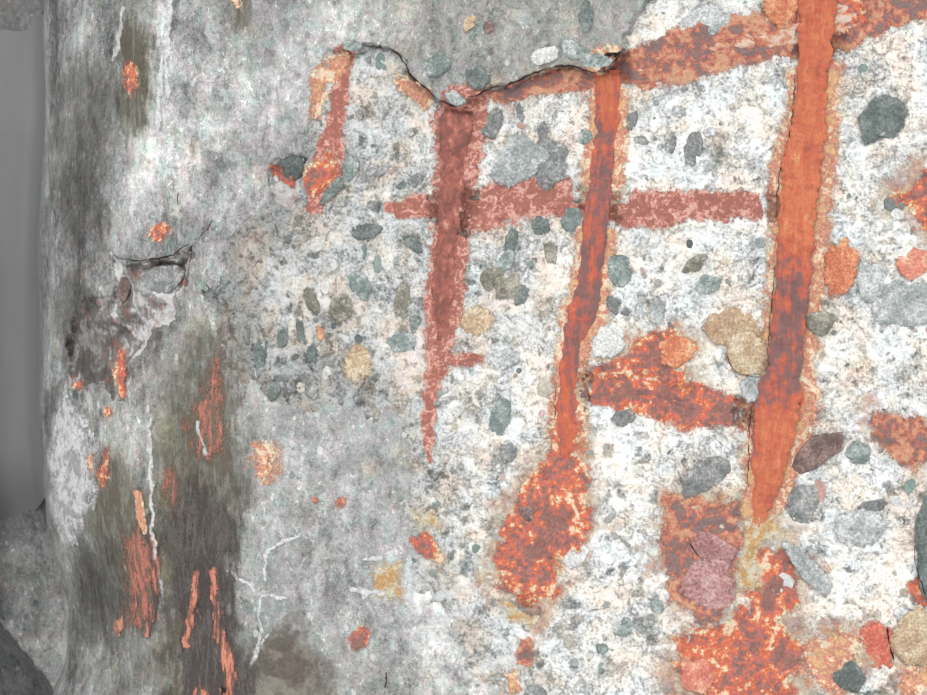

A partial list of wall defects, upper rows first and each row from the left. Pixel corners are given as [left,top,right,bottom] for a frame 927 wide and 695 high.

corrosion [308,50,351,120]
corrosion [881,157,927,242]
crack [114,215,240,280]
spalling [47,248,196,546]
corrosion [439,350,488,370]
spalling [200,0,927,695]
corrosion [598,322,703,392]
corrosion [859,395,927,473]
corrosion [112,346,258,695]
corrosion [478,414,597,695]
corrosion [645,487,876,695]
corrosion [906,577,927,607]